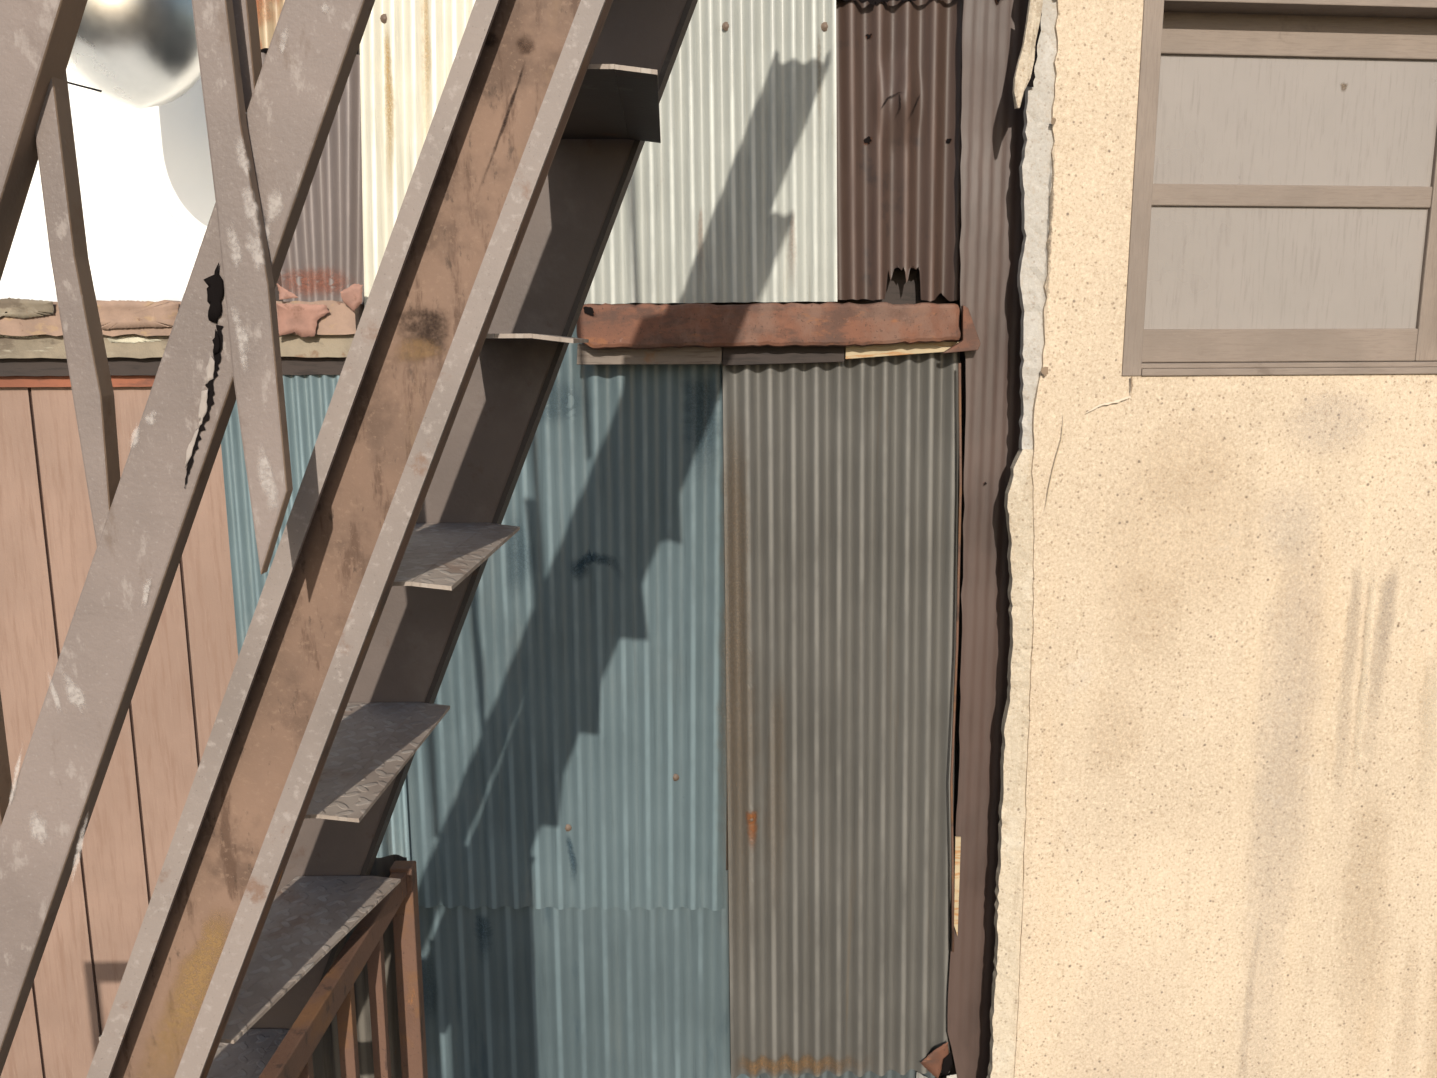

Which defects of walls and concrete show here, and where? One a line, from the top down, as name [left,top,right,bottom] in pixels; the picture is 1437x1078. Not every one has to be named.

crack [184,325,223,488]
flaking render [987,0,1057,1078]